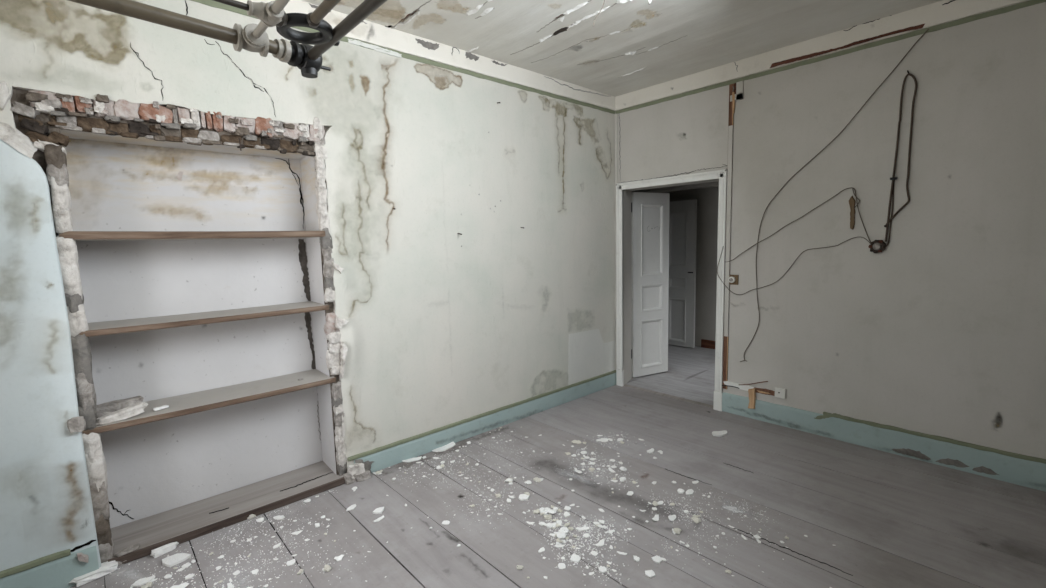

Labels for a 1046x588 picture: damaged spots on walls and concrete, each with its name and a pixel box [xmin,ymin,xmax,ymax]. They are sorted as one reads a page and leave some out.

crack [467,0,494,19]
leakage [72,35,128,63]
crack [130,42,163,96]
crack [204,39,276,117]
crack [510,0,682,97]
flaking render [0,82,544,565]
peeling [892,448,1001,476]